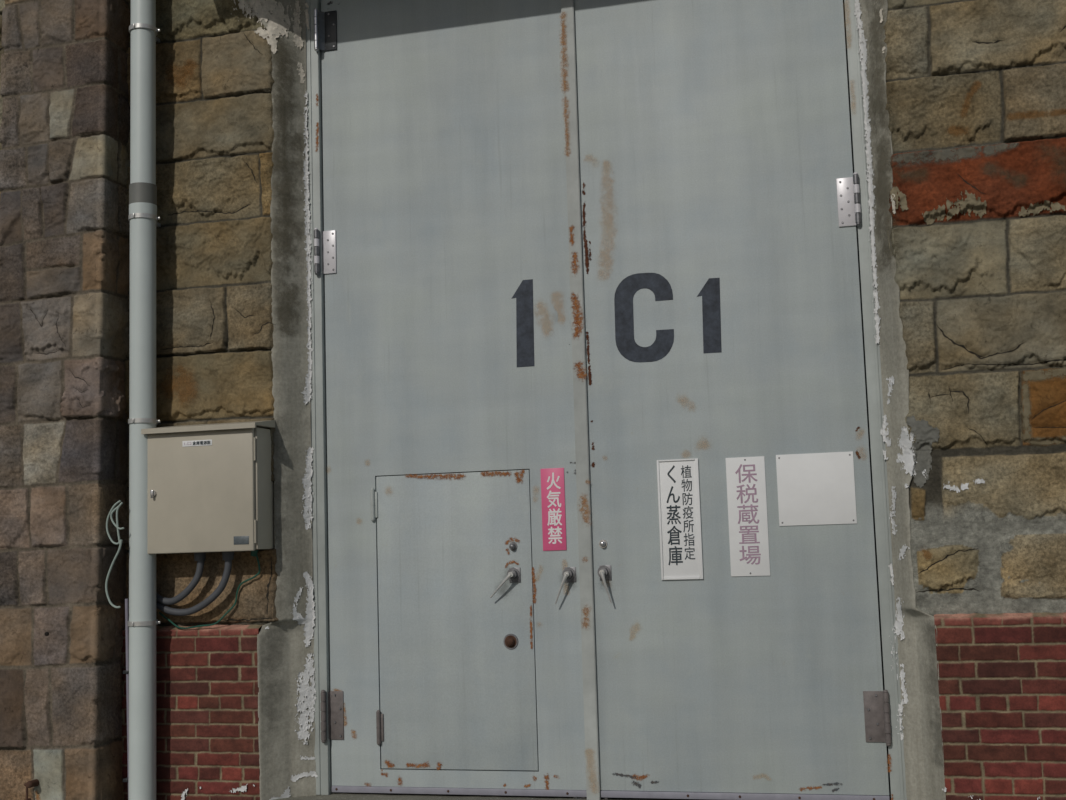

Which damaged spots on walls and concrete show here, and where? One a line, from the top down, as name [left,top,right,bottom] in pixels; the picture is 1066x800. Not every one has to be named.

corrosion [560,16,569,156]
peeling [233,0,313,404]
corrosion [569,183,592,274]
peeling [853,0,881,346]
spalling [890,186,908,214]
spalling [922,190,987,225]
corrosion [571,294,592,385]
corrosion [481,470,524,483]
peeling [880,376,940,535]
peeling [943,478,985,493]
peeling [269,570,318,800]
peeling [889,597,908,741]